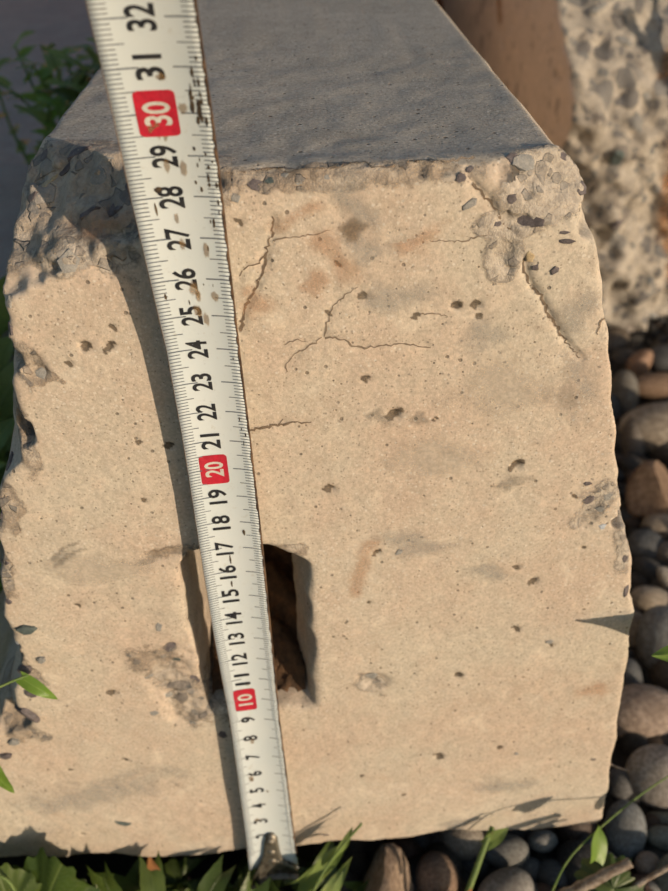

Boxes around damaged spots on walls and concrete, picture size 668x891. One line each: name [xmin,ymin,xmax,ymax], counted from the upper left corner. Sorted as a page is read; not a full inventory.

spalling [5,139,141,279]
crack [431,183,511,243]
spalling [470,144,587,283]
crack [239,217,330,332]
crack [284,287,430,372]
crack [523,258,580,358]
spalling [126,639,229,738]